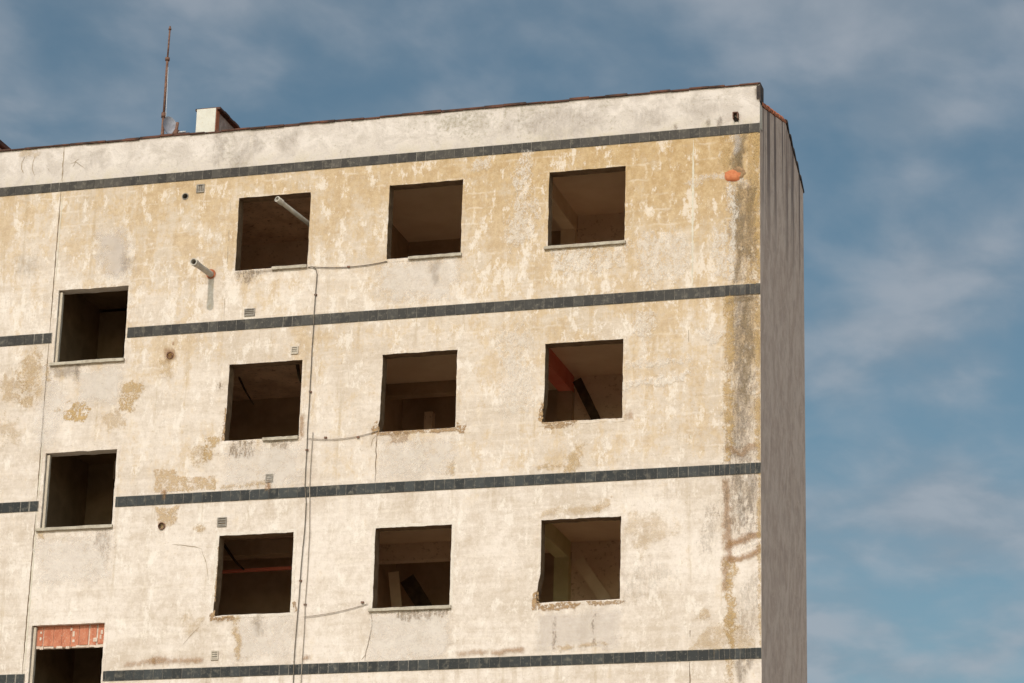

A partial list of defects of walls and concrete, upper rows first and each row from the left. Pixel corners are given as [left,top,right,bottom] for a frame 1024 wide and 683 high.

water stain [712,132,760,283]
corrosion [723,295,735,461]
peeling [54,401,91,422]
peeling [119,380,142,412]
spalling [371,421,466,435]
peeling [154,469,216,492]
spalling [532,591,624,611]
corrosion [722,533,761,648]